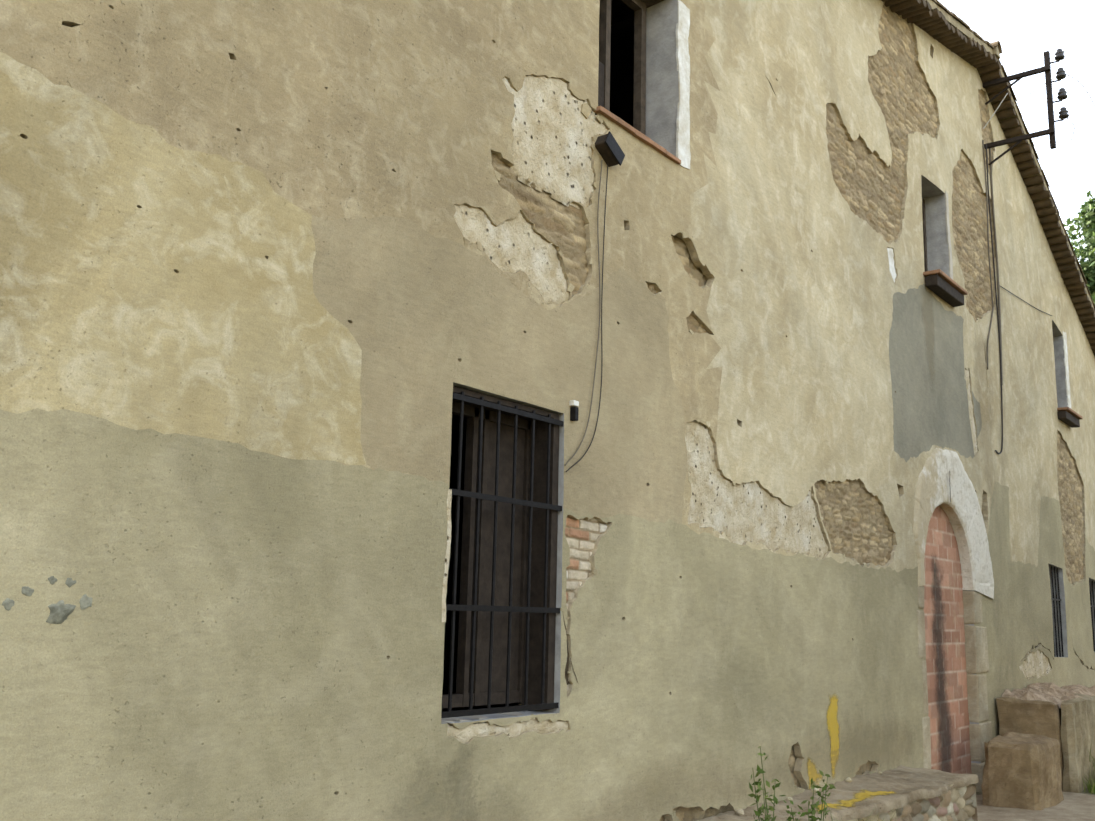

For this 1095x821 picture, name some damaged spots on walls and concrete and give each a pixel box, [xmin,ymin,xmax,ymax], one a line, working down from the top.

peeling [454,75,607,306]
spalling [671,232,708,286]
spalling [686,313,707,335]
spalling [826,1,939,283]
spalling [952,90,995,322]
flaking render [565,516,608,619]
peeling [685,419,893,567]
spalling [1057,432,1086,584]
spalling [447,714,568,744]
peeling [1019,647,1052,679]